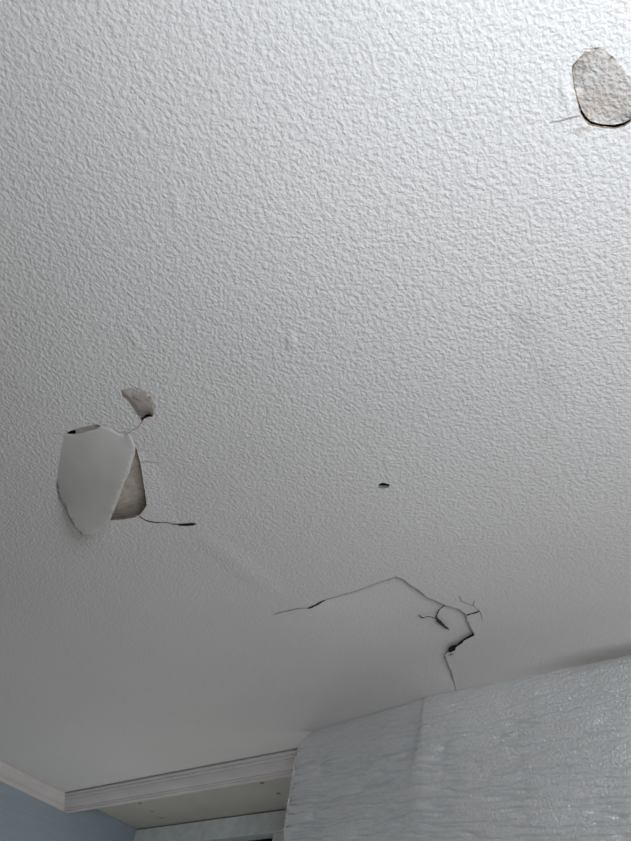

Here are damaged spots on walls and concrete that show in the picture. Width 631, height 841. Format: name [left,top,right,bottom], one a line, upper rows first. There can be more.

peeling [53,424,195,537]
crack [274,576,483,728]